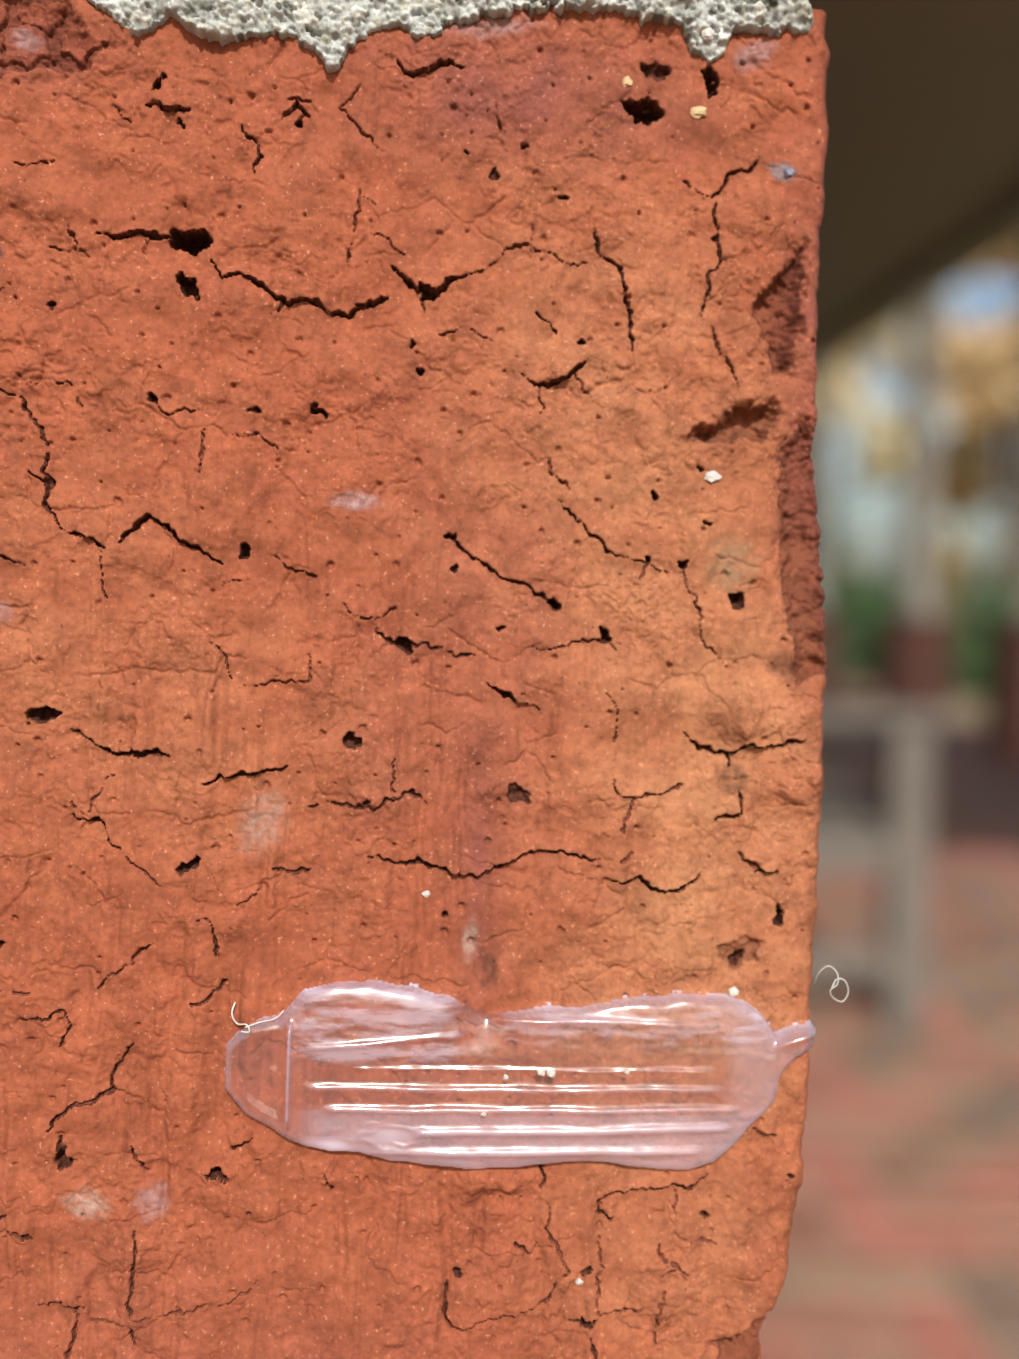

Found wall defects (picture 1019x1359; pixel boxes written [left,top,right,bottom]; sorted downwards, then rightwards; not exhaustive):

crack [49,229,174,258]
crack [210,191,635,351]
crack [683,162,757,381]
crack [522,362,588,414]
crack [0,380,241,598]
crack [451,539,546,600]
crack [540,458,727,668]
crack [70,730,169,884]
crack [367,779,700,894]
crack [683,732,805,821]
crack [46,1043,134,1153]
crack [442,1160,716,1359]